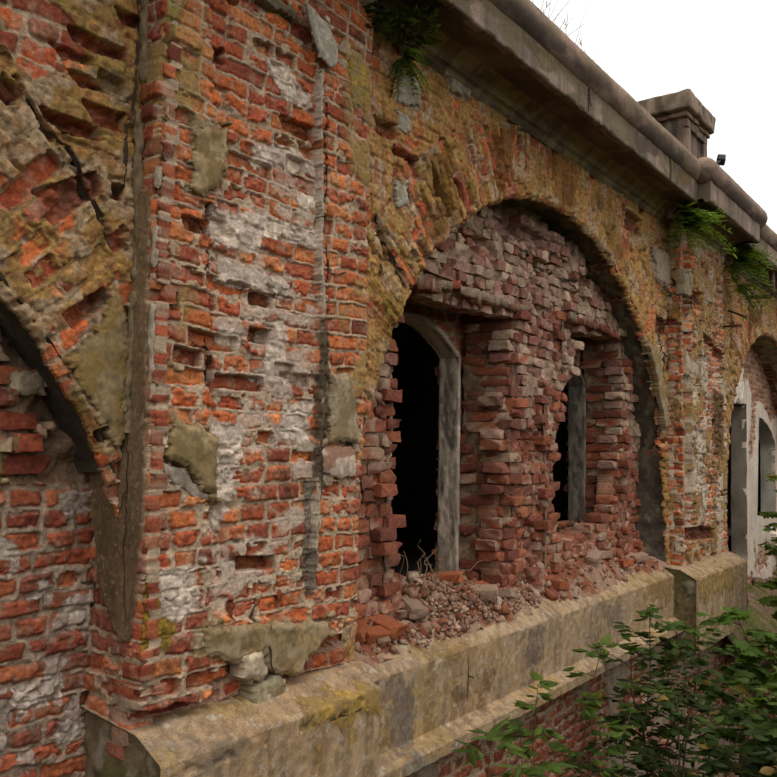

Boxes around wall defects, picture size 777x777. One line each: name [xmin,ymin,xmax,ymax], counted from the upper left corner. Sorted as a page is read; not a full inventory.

peeling [254,0,338,68]
crack [7,69,110,247]
crack [116,0,142,196]
peeling [241,56,325,181]
peeling [181,202,323,259]
peeling [213,312,358,480]
damp [300,317,331,596]
damp [0,538,21,579]
damp [25,579,94,638]
crack [118,436,129,620]
peeling [158,557,207,622]
damp [0,653,86,776]